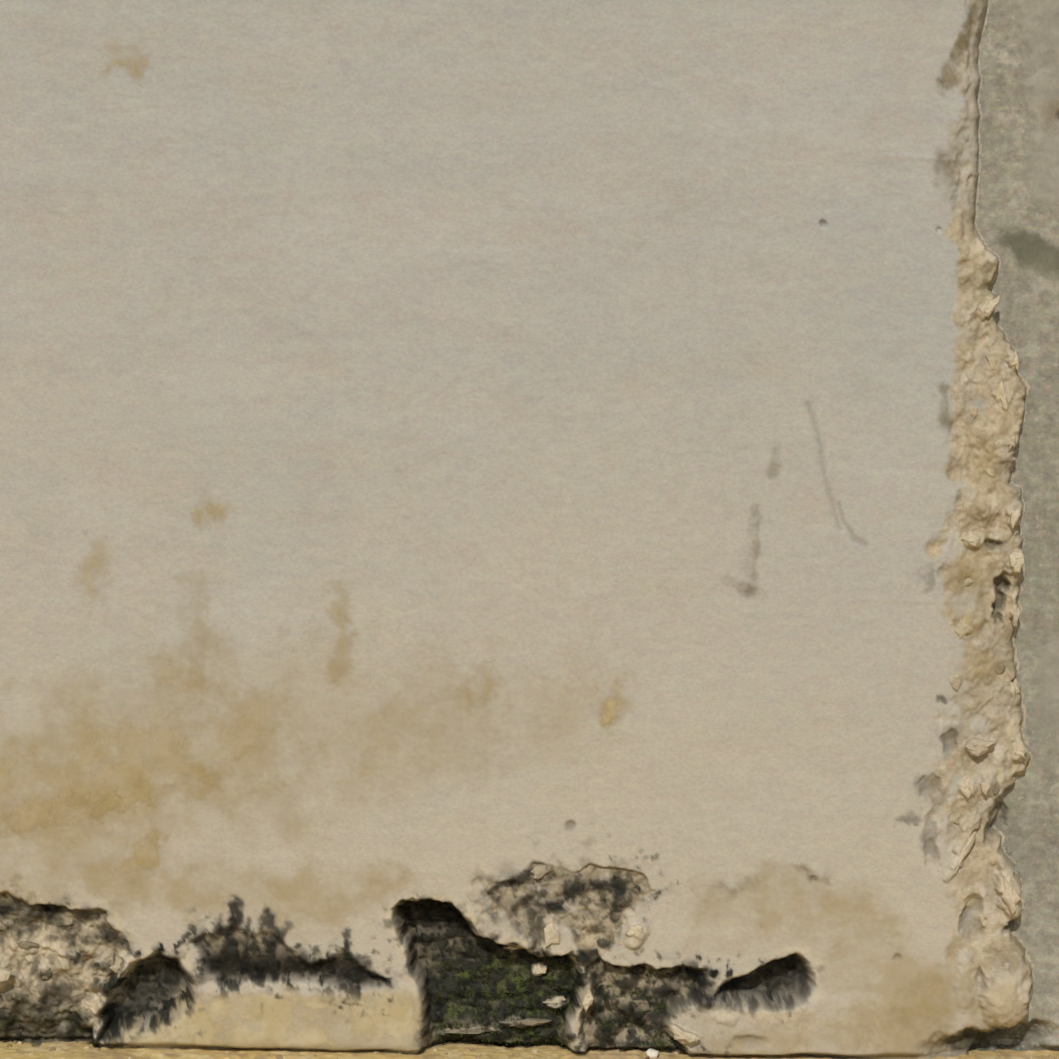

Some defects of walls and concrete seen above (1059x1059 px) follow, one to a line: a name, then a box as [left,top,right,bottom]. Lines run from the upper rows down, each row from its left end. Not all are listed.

leakage [1002,230,1059,271]
spalling [899,0,1059,1051]
leakage [488,868,532,893]
leakage [523,871,641,922]
spalling [0,859,818,1056]